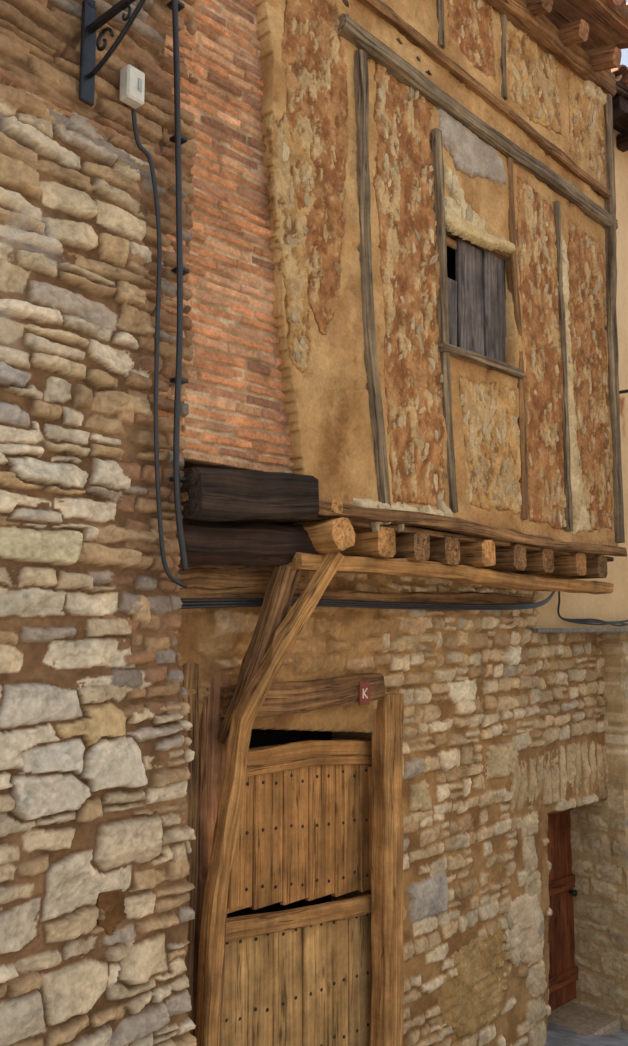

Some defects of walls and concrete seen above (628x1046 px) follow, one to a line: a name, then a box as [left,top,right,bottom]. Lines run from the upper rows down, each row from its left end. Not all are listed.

flaking render [266,0,350,373]
flaking render [371,522,404,532]
flaking render [372,64,473,517]
flaking render [446,0,605,181]
flaking render [459,176,613,532]